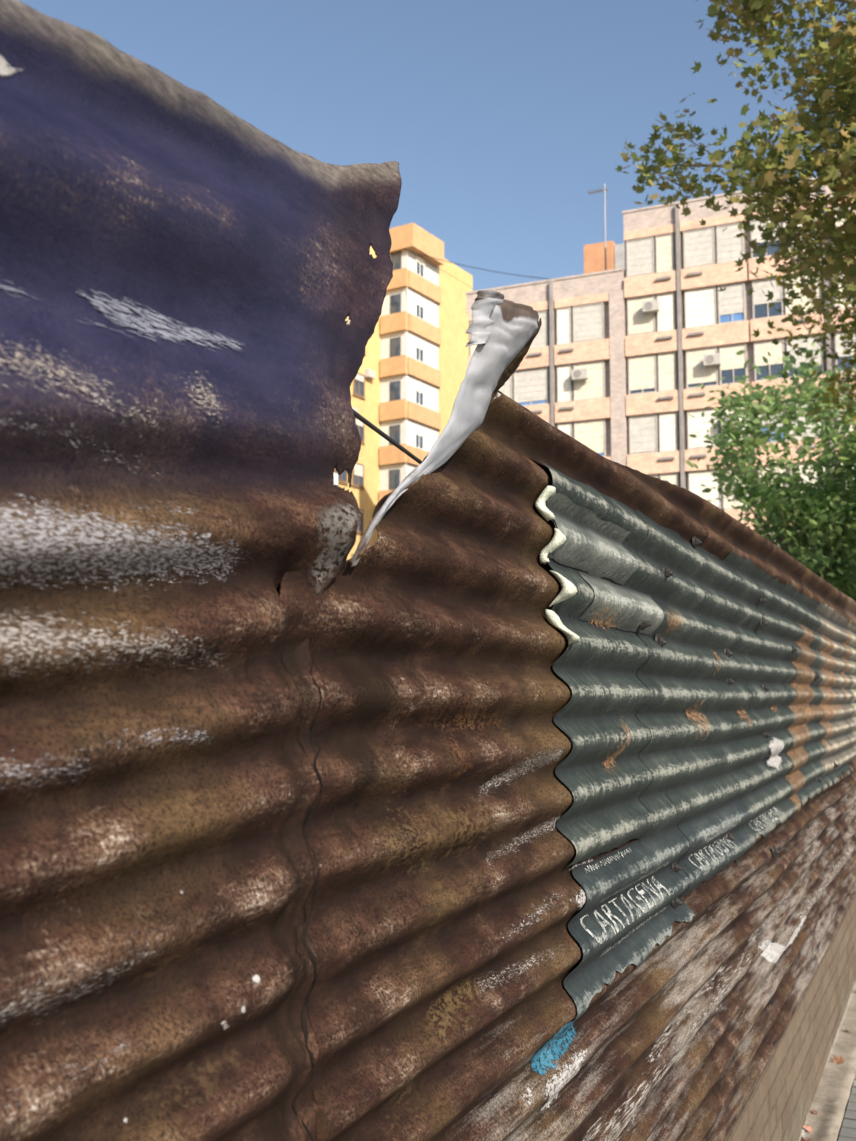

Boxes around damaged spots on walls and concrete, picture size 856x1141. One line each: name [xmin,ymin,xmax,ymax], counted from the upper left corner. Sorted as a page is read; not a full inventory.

crack [292,637,338,1141]